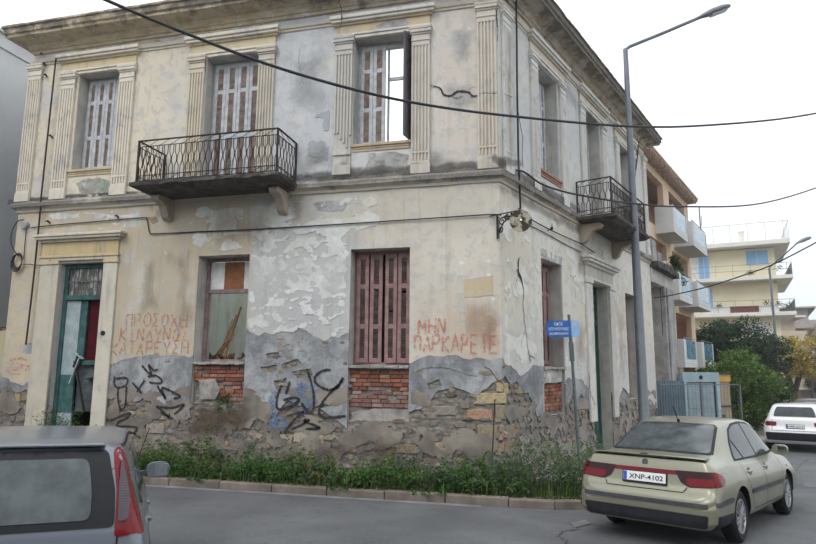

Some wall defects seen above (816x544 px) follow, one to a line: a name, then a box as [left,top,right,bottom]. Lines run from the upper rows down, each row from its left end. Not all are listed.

crack [430,85,512,98]
flaking render [0,374,28,393]
flaking render [108,197,621,477]
crack [517,257,535,361]